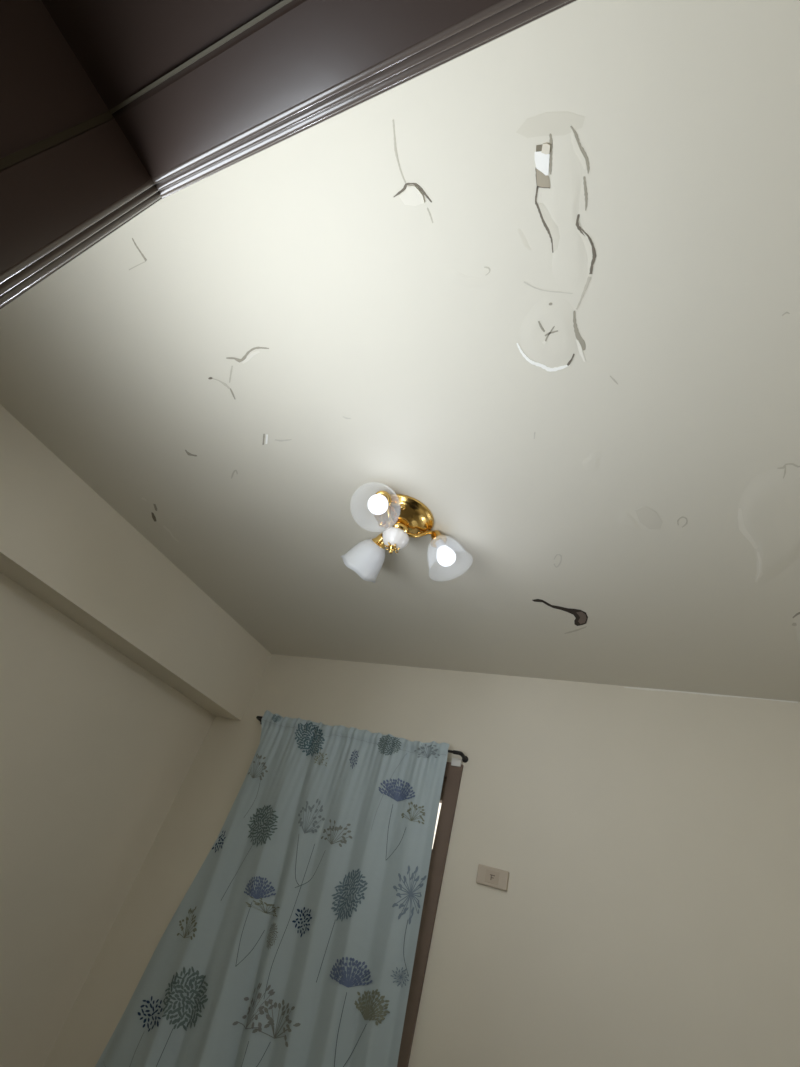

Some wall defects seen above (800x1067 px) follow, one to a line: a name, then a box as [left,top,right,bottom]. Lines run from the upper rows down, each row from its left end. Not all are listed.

flaking render [535,143,550,187]
peeling [399,185,425,206]
peeling [516,343,568,372]